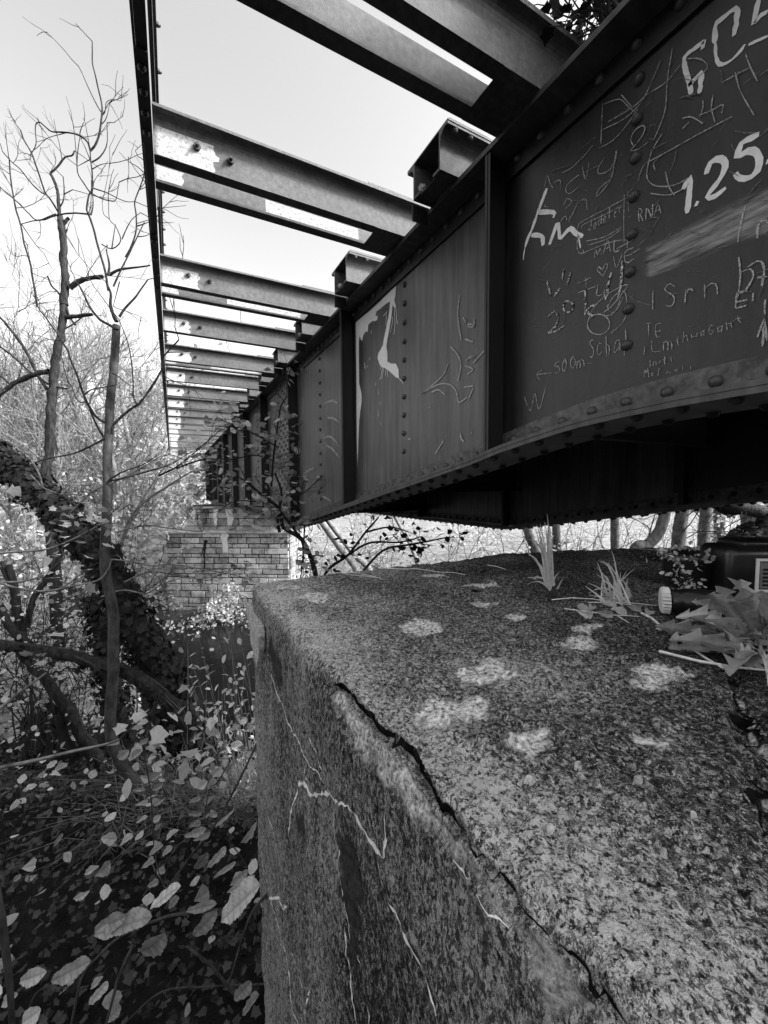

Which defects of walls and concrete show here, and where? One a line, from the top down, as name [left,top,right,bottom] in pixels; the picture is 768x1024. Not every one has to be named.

crack [320,682,626,1023]